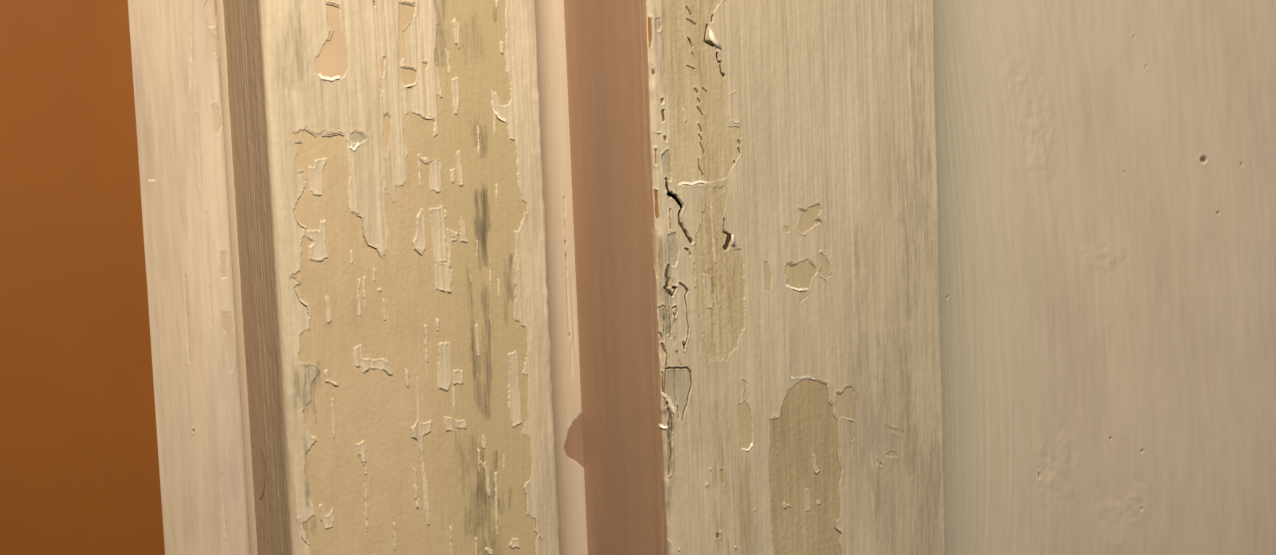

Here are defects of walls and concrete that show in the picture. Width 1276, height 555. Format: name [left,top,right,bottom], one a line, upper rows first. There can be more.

peeling [287,0,543,555]
peeling [647,0,745,363]
peeling [784,251,832,291]
peeling [797,202,823,235]
peeling [658,305,691,474]
peeling [769,376,856,555]